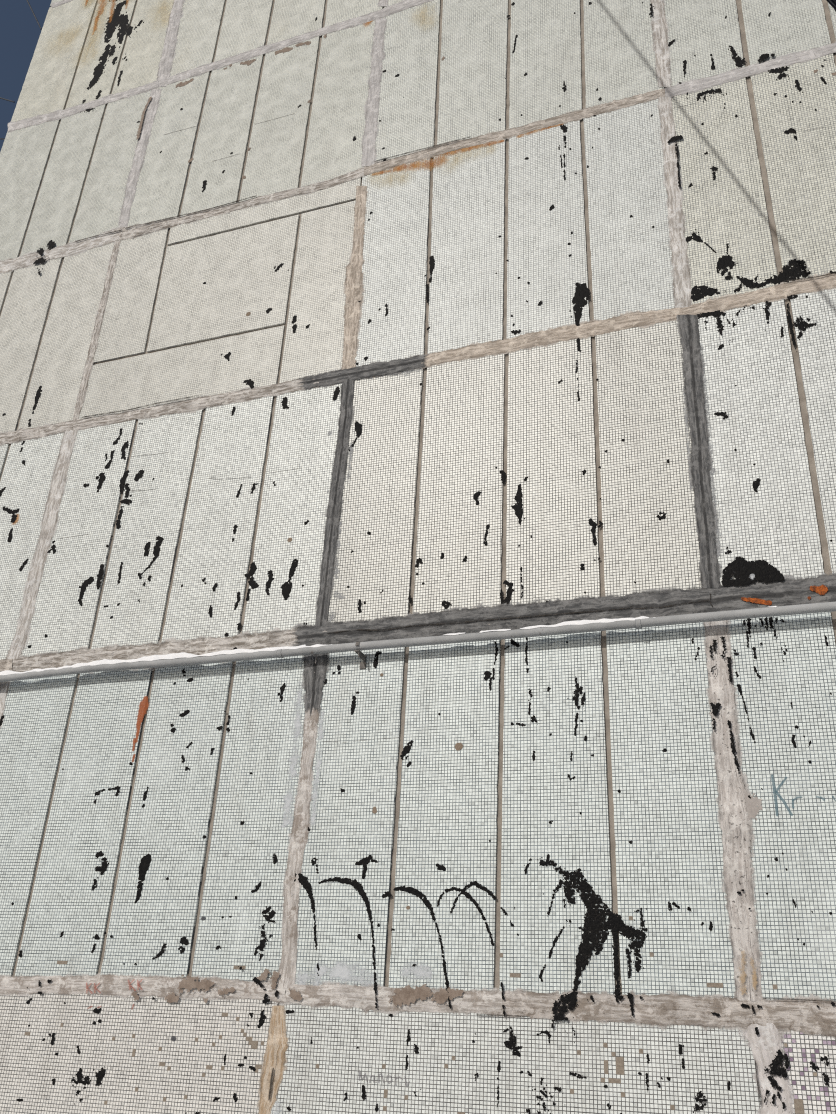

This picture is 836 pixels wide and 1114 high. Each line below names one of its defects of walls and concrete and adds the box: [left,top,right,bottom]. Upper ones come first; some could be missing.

rust [808,585,828,600]
rust [741,597,772,605]
rust [132,696,149,762]